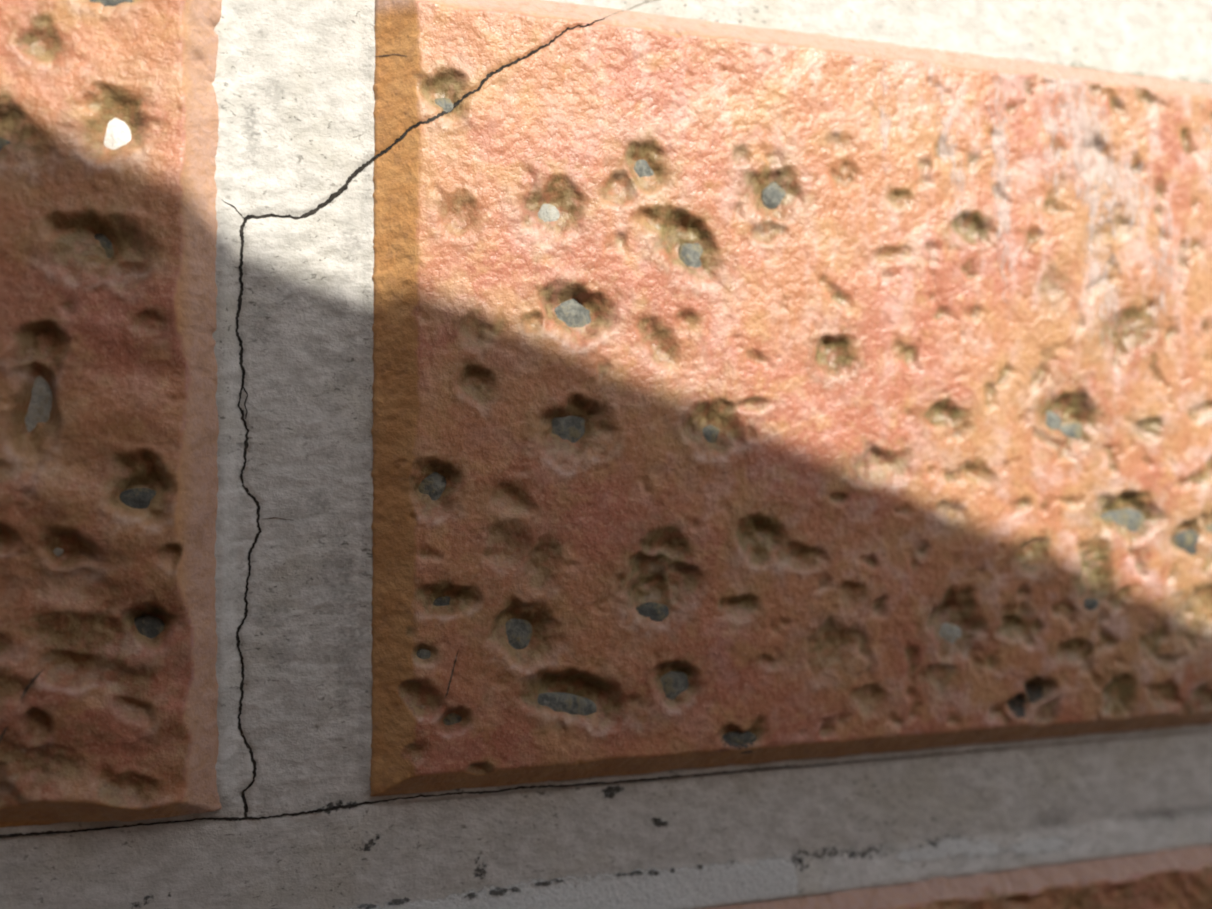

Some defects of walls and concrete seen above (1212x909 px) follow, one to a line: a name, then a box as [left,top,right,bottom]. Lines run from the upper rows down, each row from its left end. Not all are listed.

crack [0,0,1008,838]